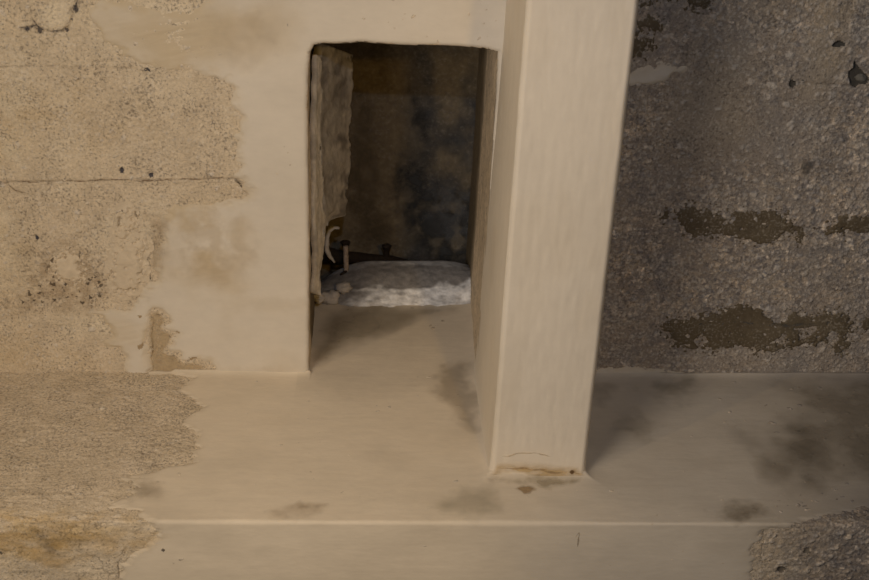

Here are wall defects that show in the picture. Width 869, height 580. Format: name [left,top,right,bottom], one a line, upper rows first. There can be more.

spalling [632,0,713,61]
spalling [653,199,869,248]
peeling [137,314,199,371]
spalling [655,303,869,358]